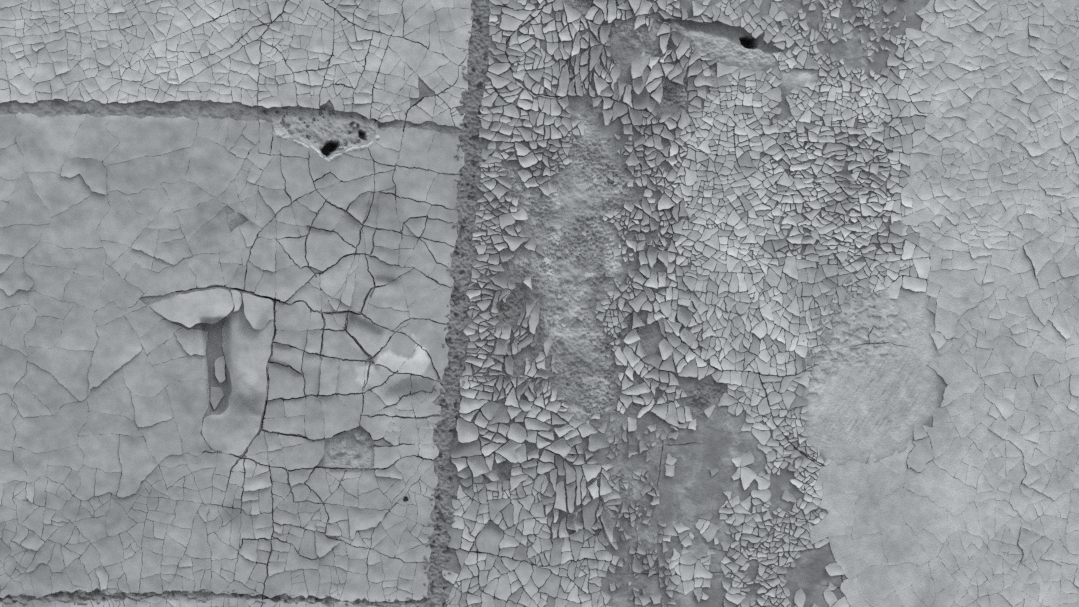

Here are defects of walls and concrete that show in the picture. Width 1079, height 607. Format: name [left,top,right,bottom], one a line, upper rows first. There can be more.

peeling [0,0,473,607]
crack [176,127,449,607]
crack [211,0,466,132]
peeling [442,0,1079,607]